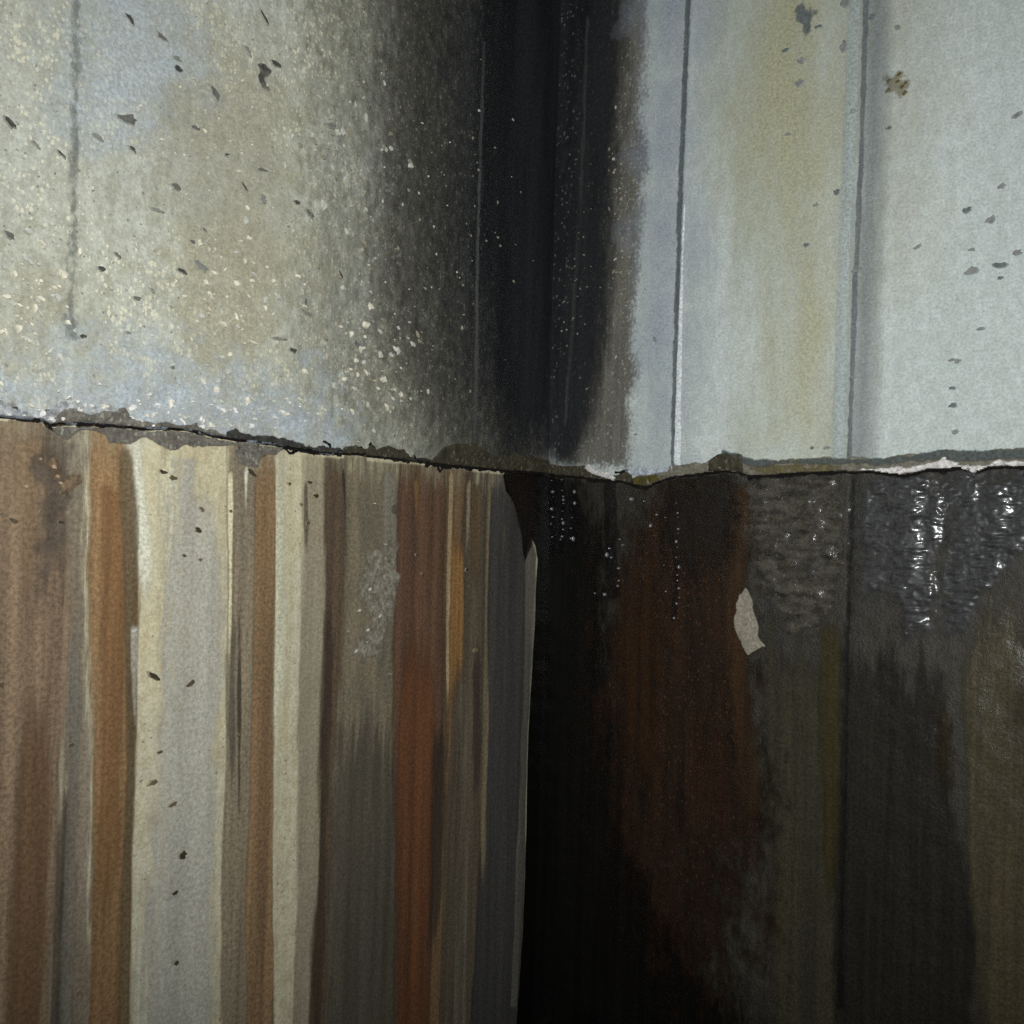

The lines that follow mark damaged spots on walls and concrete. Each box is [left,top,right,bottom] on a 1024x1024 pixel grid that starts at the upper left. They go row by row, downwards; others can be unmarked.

rust [0,420,74,1024]
rust [88,427,139,1024]
rust [246,454,276,1024]
rust [309,458,346,1024]
rust [392,464,492,1024]
crack [0,400,1024,490]
damp [363,0,672,481]
damp [470,472,743,1024]
rust [594,479,774,1001]
peeling [734,588,765,655]
damp [767,596,1024,1024]